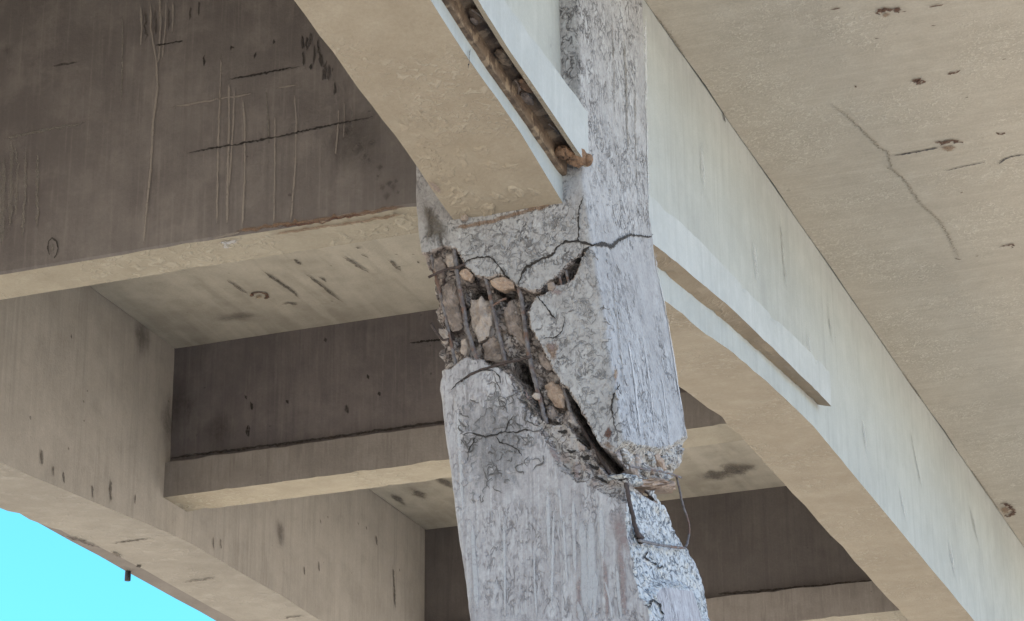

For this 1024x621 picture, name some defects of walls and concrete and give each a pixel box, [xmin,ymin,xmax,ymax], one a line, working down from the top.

crack [233,66,300,79]
crack [189,116,373,153]
crack [833,106,1020,257]
crack [465,195,653,338]
crack [463,416,534,461]
spalling [422,218,710,621]
leakage [707,466,752,479]